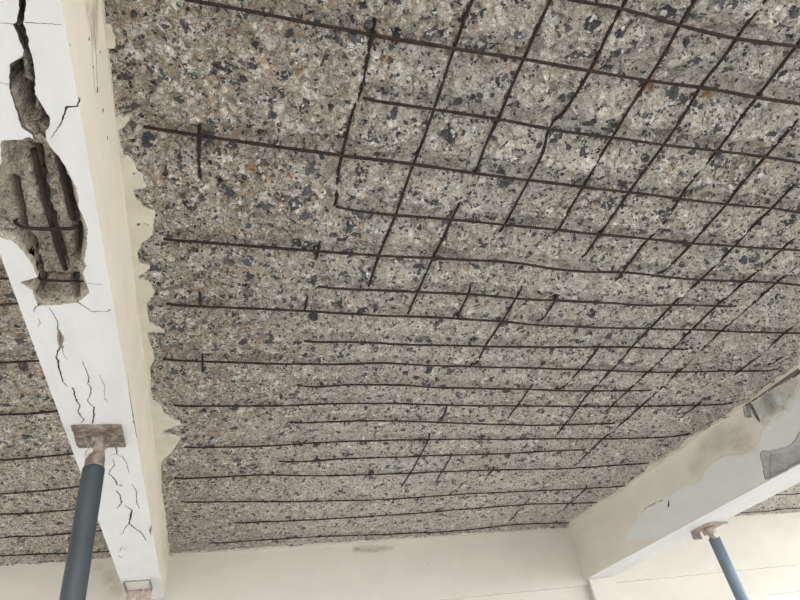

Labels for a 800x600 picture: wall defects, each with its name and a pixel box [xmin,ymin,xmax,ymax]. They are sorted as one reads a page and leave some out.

crack [51,22,98,138]
spalling [184,0,800,163]
spalling [0,0,89,566]
crack [33,303,108,423]
spalling [163,358,779,373]
spalling [143,125,800,249]
spalling [163,237,800,332]
spalling [166,302,800,346]
spalling [335,205,800,284]
spalling [362,97,800,211]
crack [108,447,146,558]
peeling [625,382,800,541]